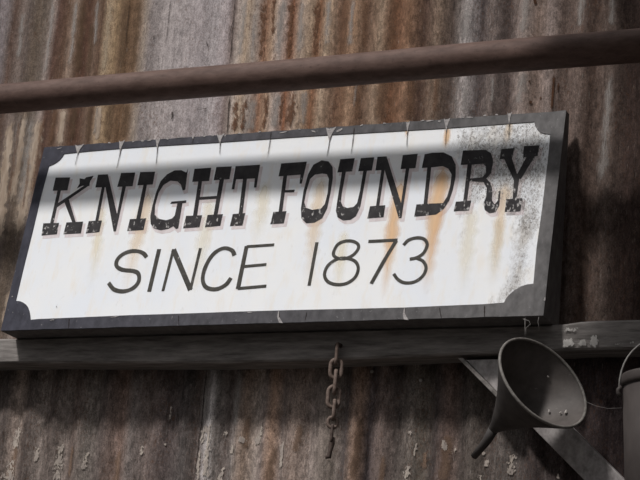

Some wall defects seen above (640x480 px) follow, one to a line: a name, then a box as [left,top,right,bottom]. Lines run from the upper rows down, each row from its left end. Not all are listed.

corrosion [258,0,276,58]
corrosion [285,2,294,58]
corrosion [312,3,323,54]
corrosion [229,100,248,132]
corrosion [278,91,298,127]
peeling [0,459,14,480]
peeling [52,444,64,480]
peeling [196,423,212,480]